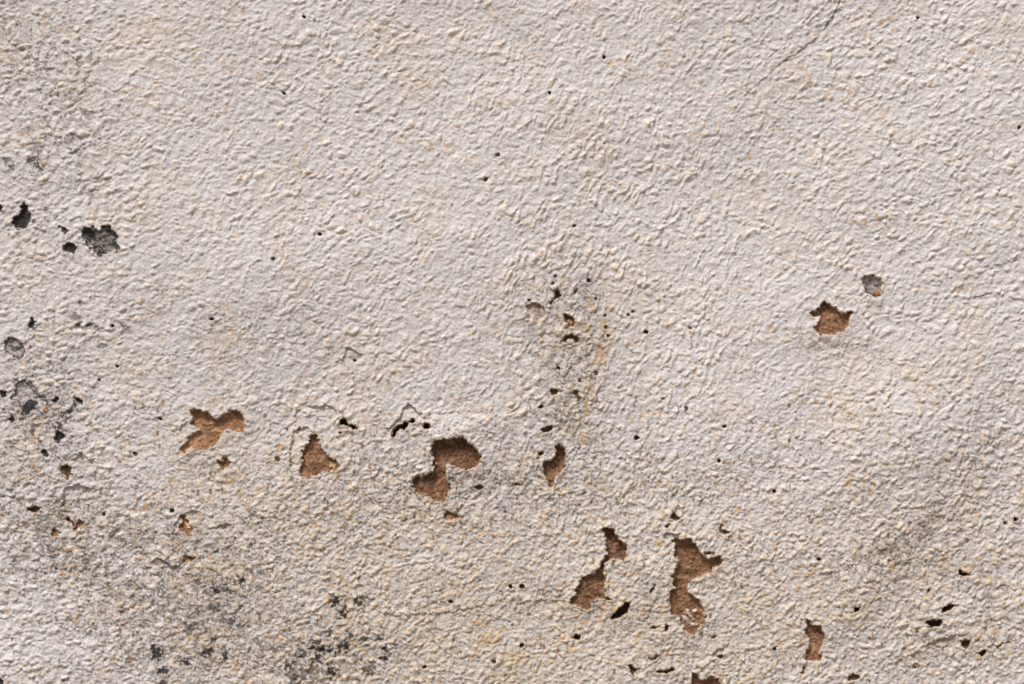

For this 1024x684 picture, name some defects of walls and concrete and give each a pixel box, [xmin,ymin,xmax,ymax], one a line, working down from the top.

spalling [0,201,34,230]
spalling [57,223,123,258]
spalling [860,272,886,300]
spalling [808,300,855,338]
spalling [170,406,247,472]
spalling [288,425,341,480]
spalling [379,401,486,522]
spalling [537,426,569,490]
spalling [514,526,630,620]
spalling [651,512,726,659]
spalling [801,618,827,674]